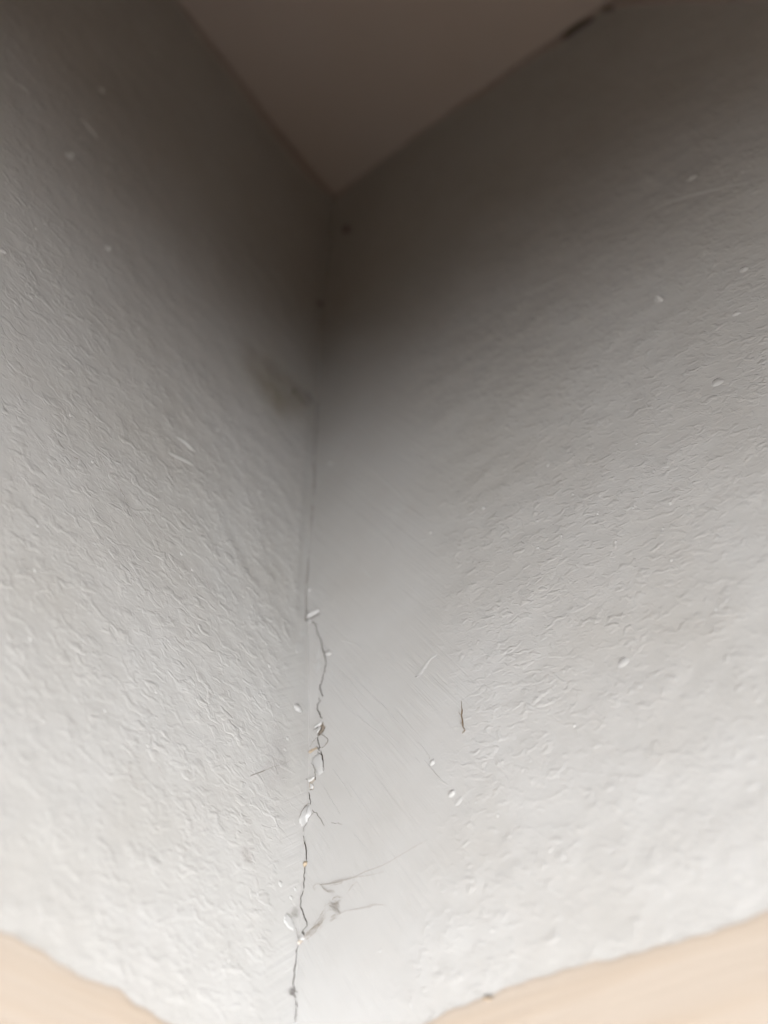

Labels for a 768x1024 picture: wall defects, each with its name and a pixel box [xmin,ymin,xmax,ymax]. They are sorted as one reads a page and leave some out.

crack [291,550,342,1020]